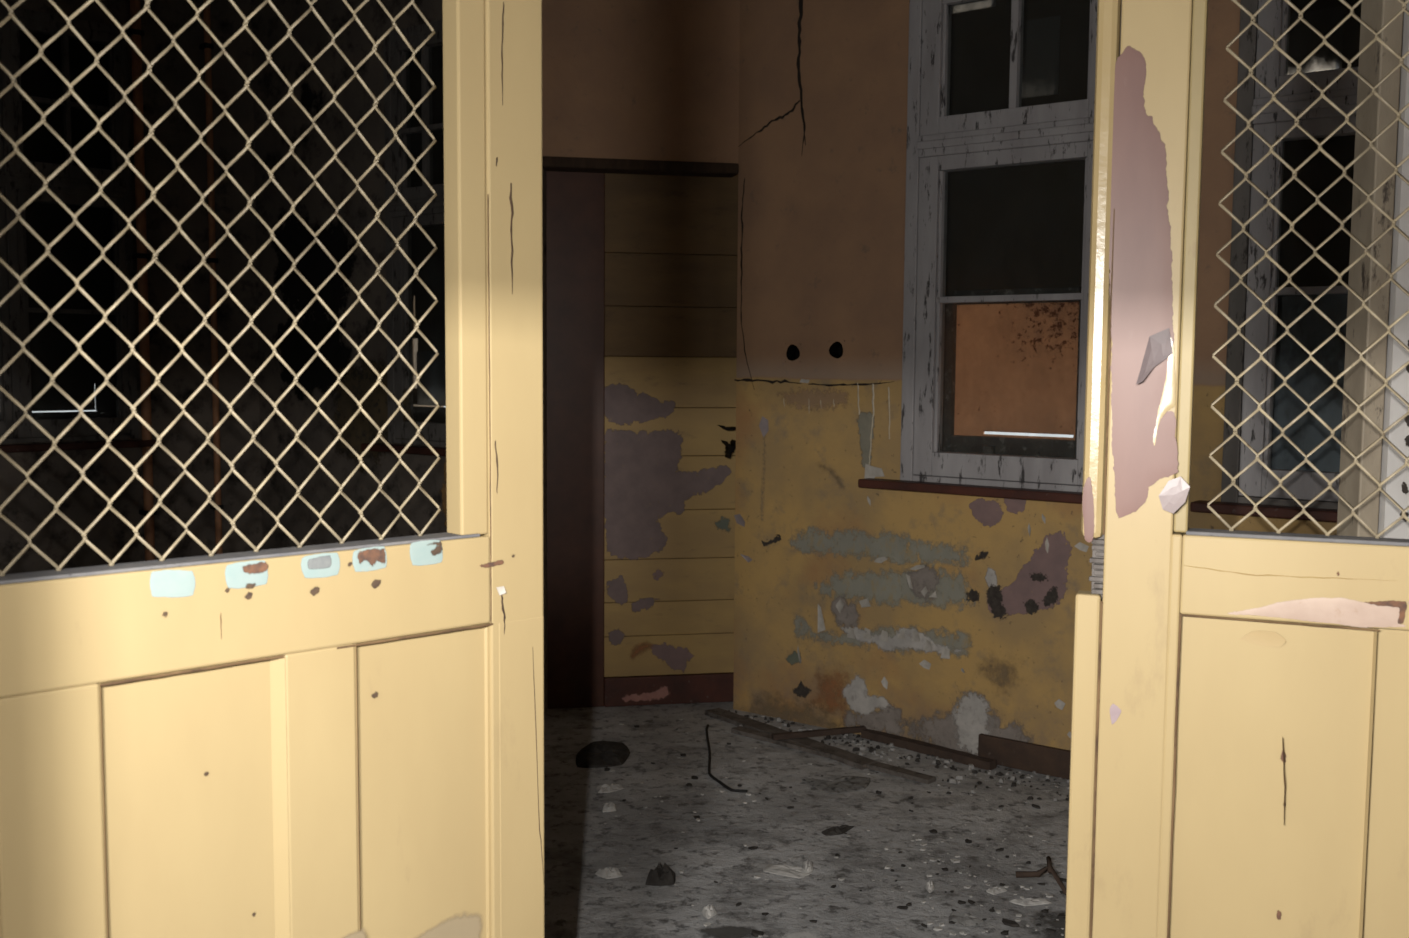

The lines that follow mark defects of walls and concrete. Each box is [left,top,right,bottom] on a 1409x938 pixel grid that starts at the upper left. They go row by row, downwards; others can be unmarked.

crack [717,0,894,459]
peeling [1109,46,1190,518]
peeling [608,629,694,702]
peeling [604,383,732,613]
spalling [793,681,812,698]
peeling [762,477,1105,673]
flaking render [843,675,1032,756]
peeling [1228,597,1409,628]